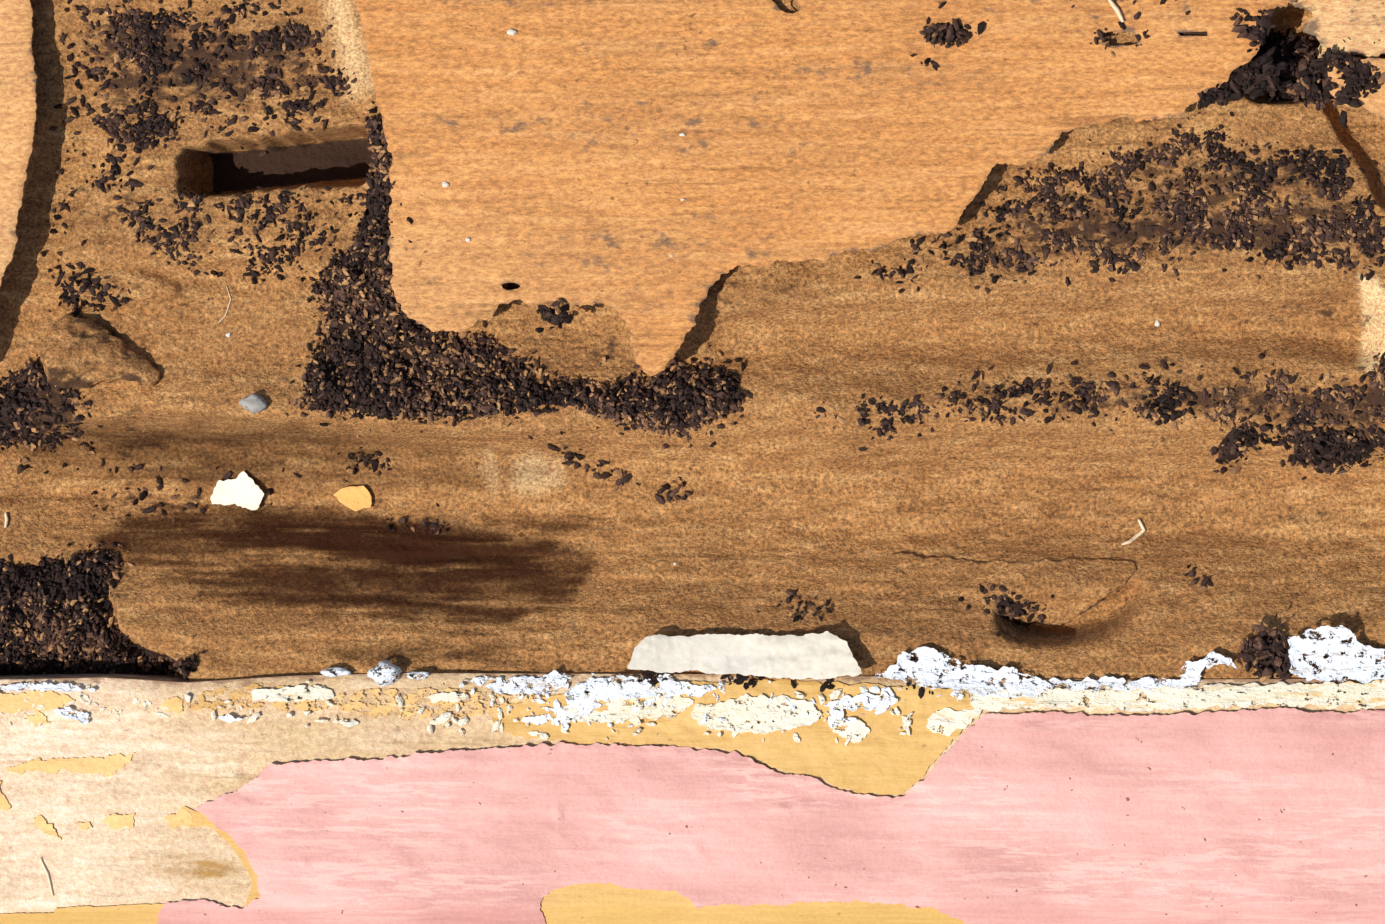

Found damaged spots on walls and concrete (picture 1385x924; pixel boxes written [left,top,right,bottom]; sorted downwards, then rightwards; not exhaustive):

crack [1179,30,1207,38]
peeling [333,485,372,511]
water stain [96,510,590,623]
peeling [0,625,1385,795]
peeling [0,752,136,810]
peeling [33,815,62,840]
peeling [78,813,135,830]
peeling [165,806,260,906]
peeling [0,903,164,924]
peeling [540,882,964,924]